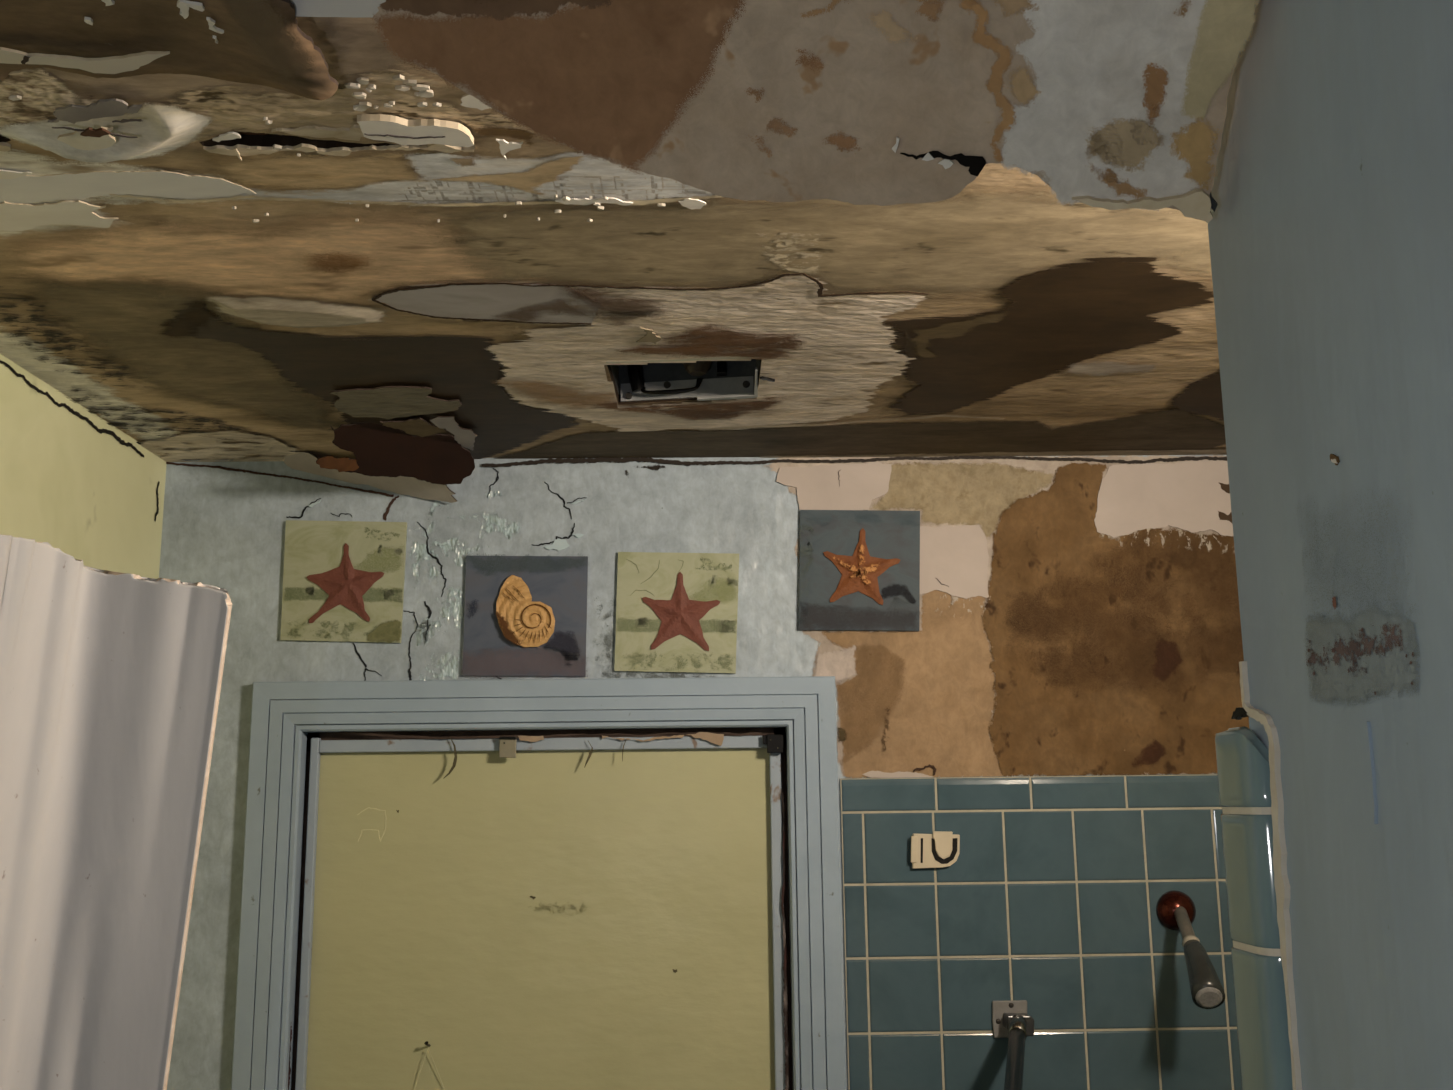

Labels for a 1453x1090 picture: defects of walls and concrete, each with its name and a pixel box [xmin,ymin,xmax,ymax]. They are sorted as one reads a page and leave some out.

flaking render [0,47,170,128]
peeling [0,69,722,239]
peeling [921,152,953,169]
peeling [999,0,1215,211]
peeling [0,326,477,503]
leakage [0,0,1259,778]
crack [338,731,762,739]
peeling [760,450,1235,778]
peeling [1231,707,1248,720]
corrosion [1306,622,1414,677]